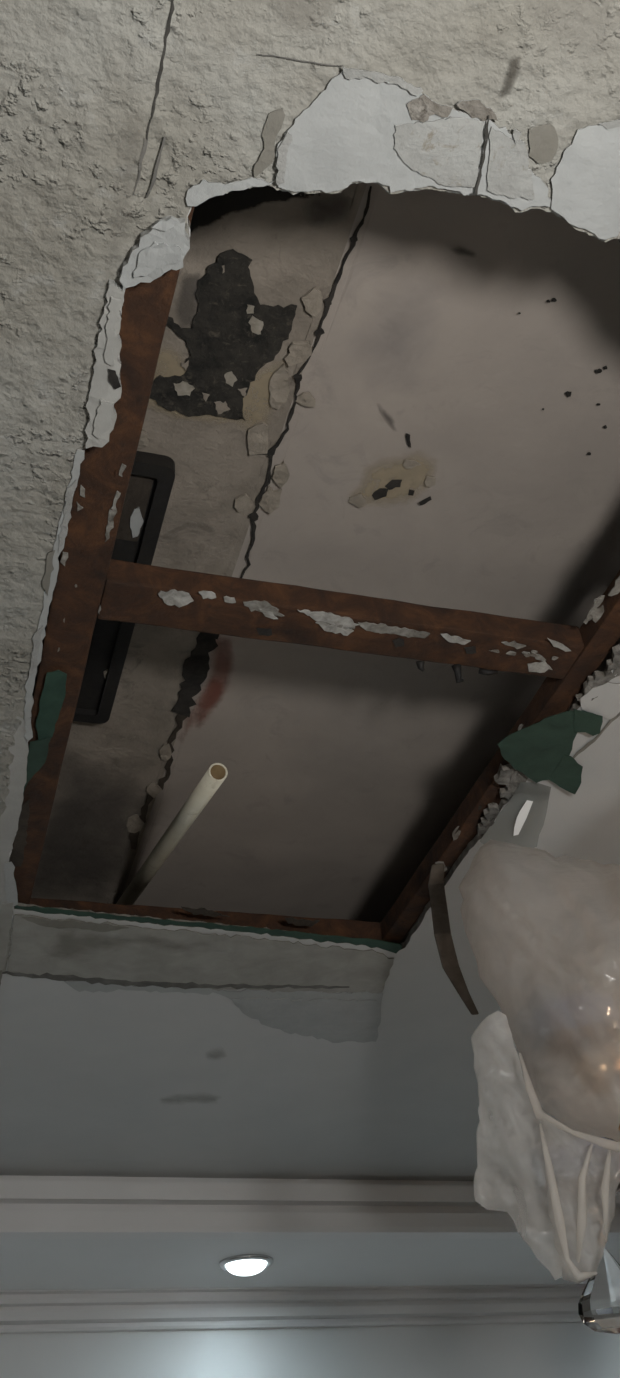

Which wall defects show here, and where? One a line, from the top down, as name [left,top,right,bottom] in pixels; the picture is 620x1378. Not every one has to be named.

crack [133,0,174,198]
crack [475,115,490,196]
crack [234,186,372,578]
peeling [0,66,620,994]
crack [126,632,220,850]